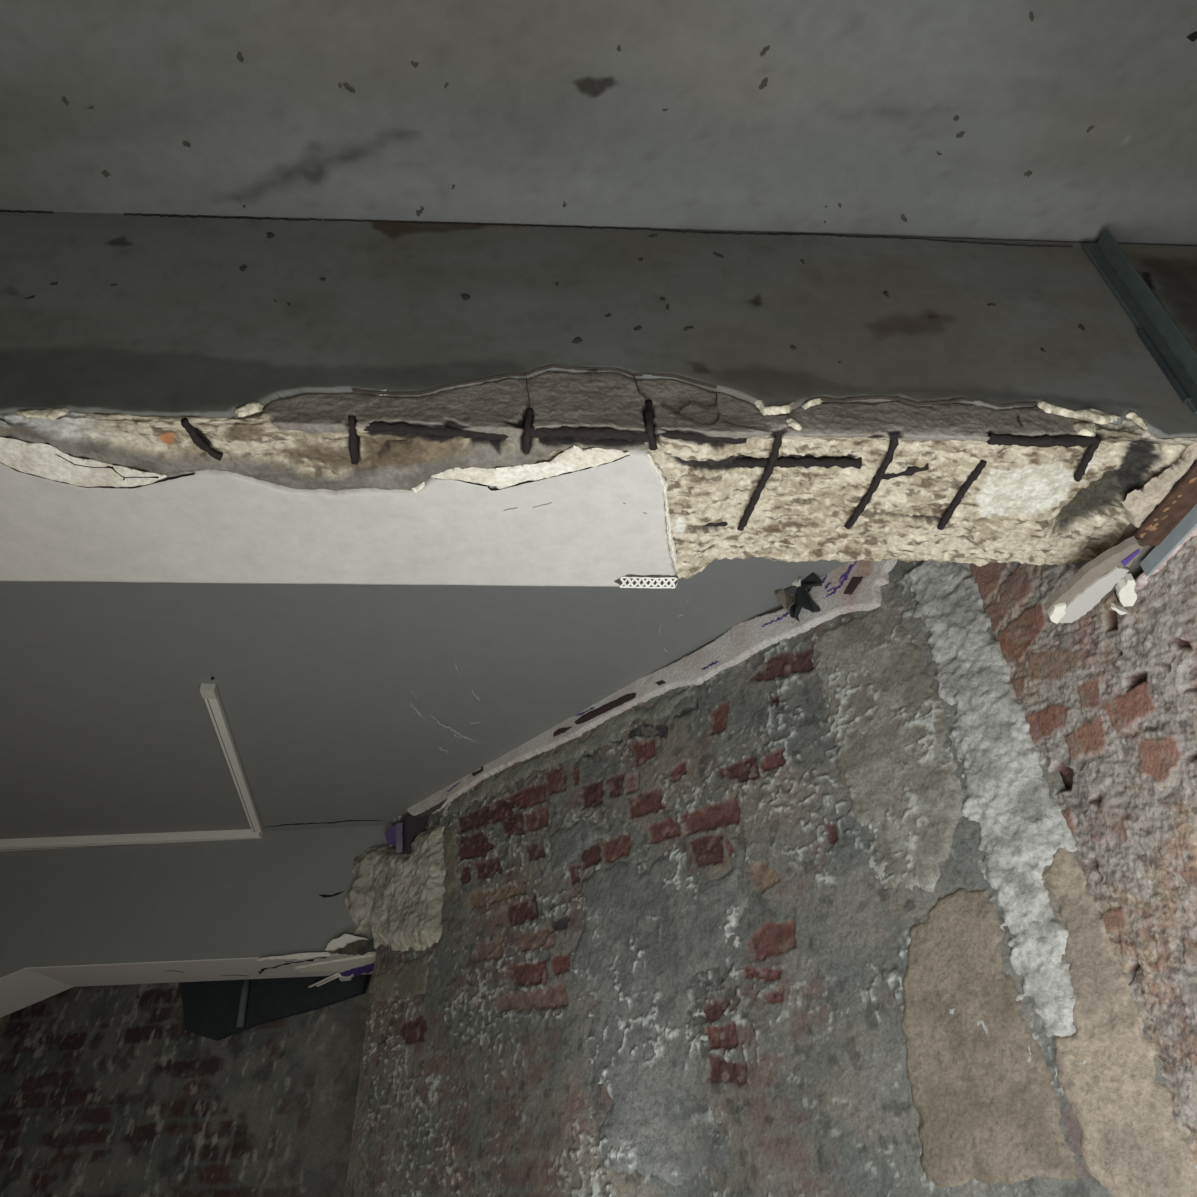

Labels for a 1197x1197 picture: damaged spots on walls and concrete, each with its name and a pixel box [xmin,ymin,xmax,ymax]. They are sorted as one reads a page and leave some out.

crack [0,207,53,215]
crack [124,214,1073,247]
crack [352,365,769,432]
spalling [0,371,1197,624]
rust [1140,477,1196,538]
crack [267,819,382,827]
spalling [256,825,446,982]
peeling [901,888,1077,1188]